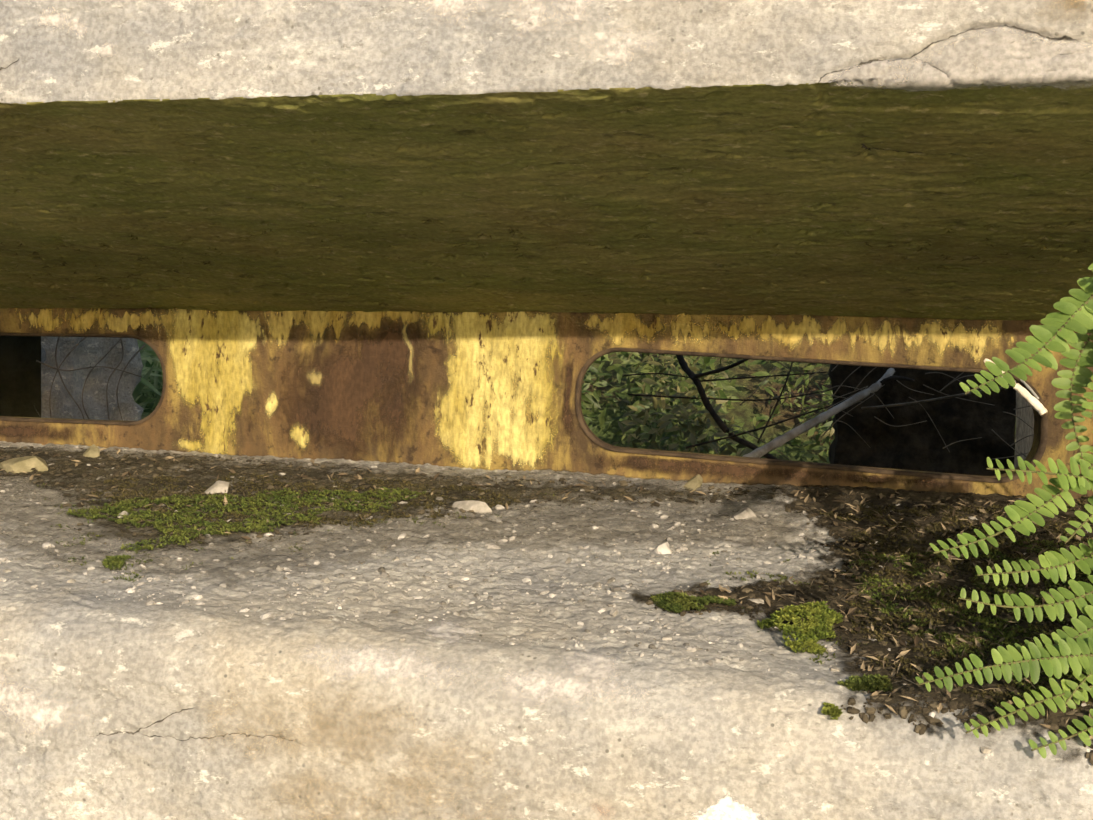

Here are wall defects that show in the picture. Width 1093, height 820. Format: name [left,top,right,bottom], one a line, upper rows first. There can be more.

crack [819,24,1091,82]
rust [282,317,418,459]
rust [562,364,573,433]
rust [0,425,70,439]
rust [600,456,940,485]
crack [97,708,303,745]